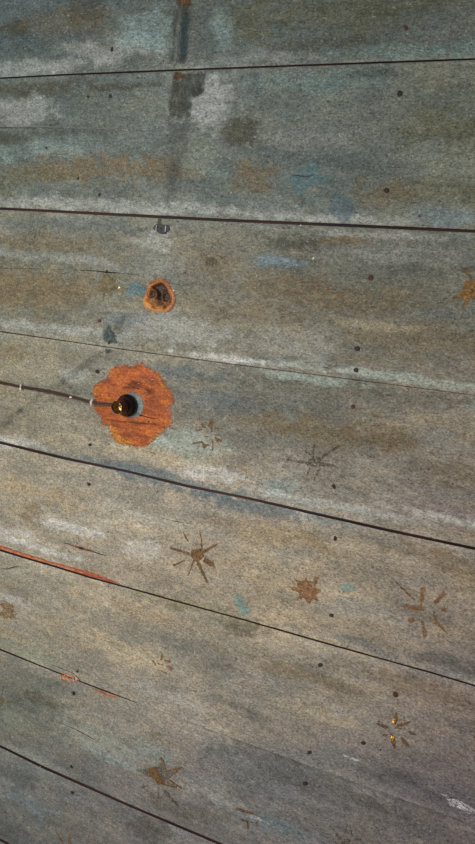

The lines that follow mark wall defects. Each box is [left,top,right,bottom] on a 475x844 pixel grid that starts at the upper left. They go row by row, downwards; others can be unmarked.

leakage [172,0,190,63]
leakage [169,72,205,118]